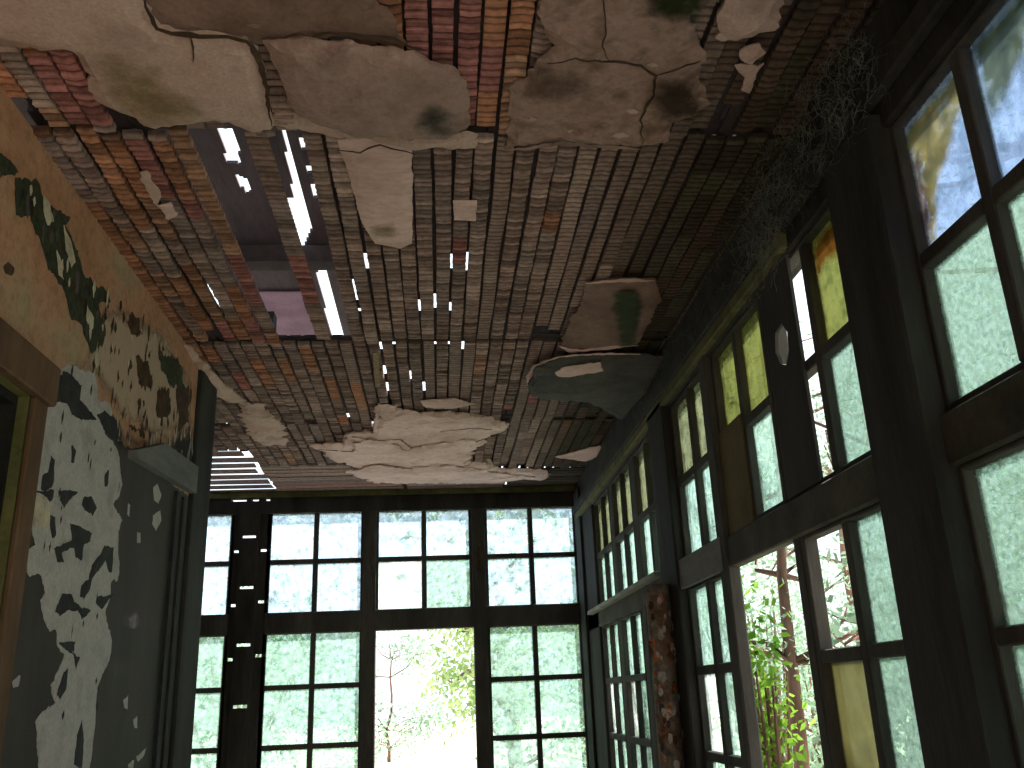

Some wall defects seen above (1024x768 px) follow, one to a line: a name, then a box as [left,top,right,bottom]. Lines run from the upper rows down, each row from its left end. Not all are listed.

crack [143,0,426,127]
crack [547,0,701,146]
peeling [735,43,766,93]
water stain [614,291,642,347]
spalling [526,345,640,385]
spalling [345,407,379,445]
peeling [0,153,193,768]